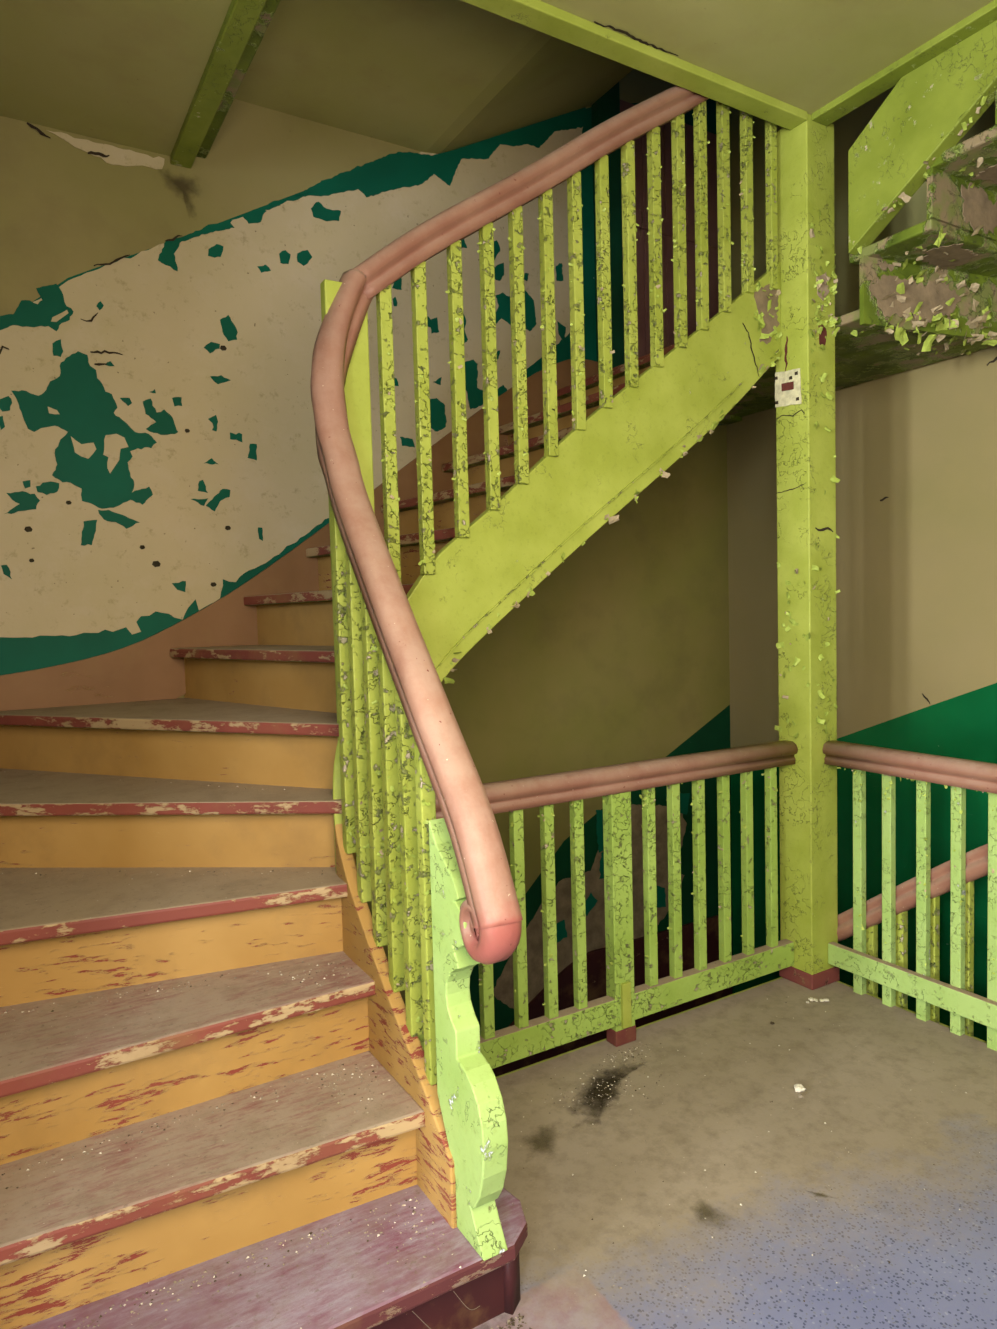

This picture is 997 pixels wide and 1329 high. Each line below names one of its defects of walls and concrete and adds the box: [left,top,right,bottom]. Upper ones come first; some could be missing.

crack [27,122,51,138]
crack [88,150,110,158]
peeling [941,85,997,138]
peeling [0,107,606,638]
peeling [598,283,679,402]
peeling [647,176,746,262]
peeling [680,404,735,458]
peeling [677,216,782,388]
peeling [809,157,997,400]
peeling [776,562,838,734]